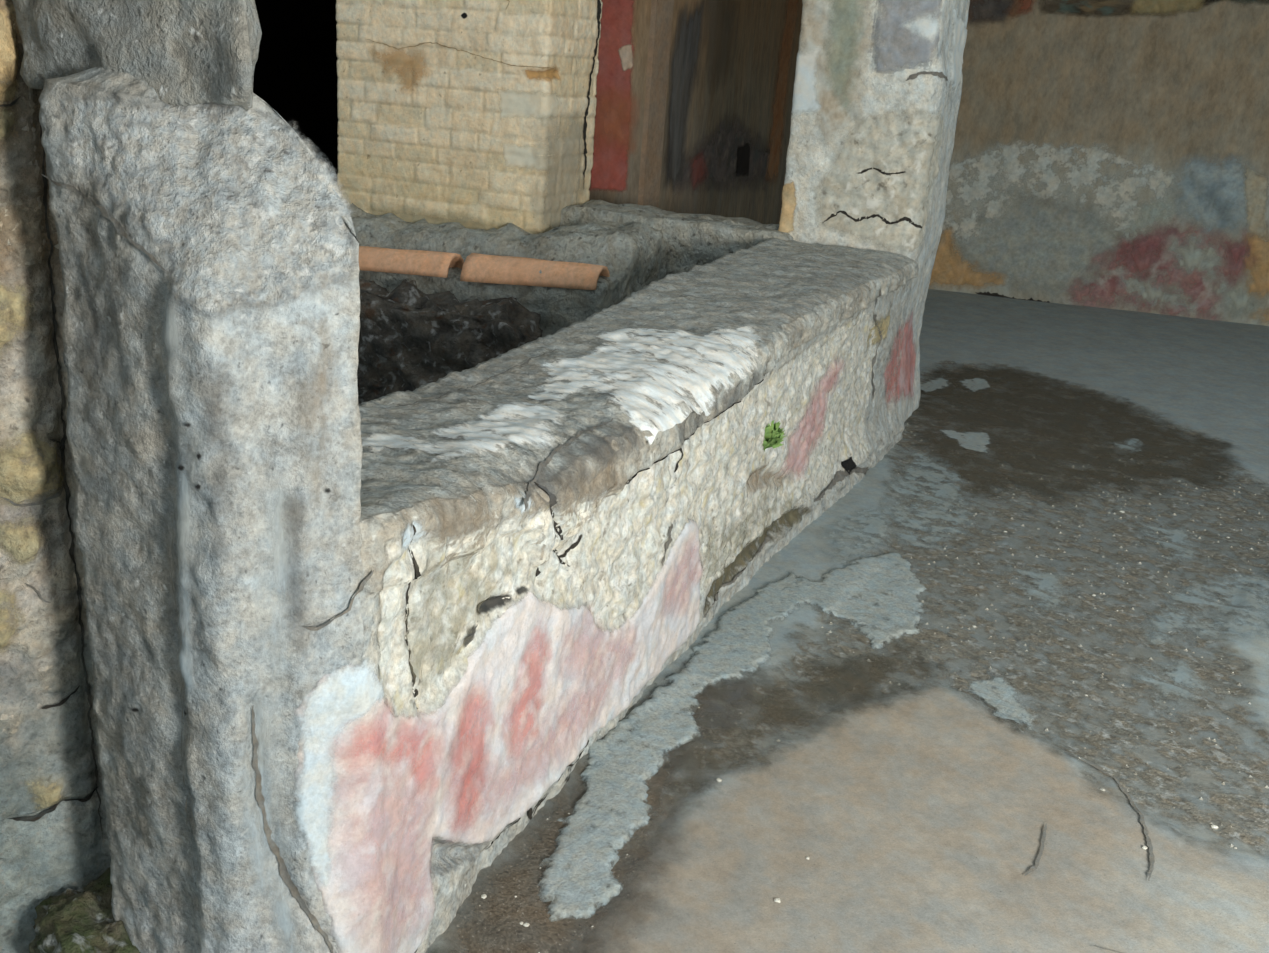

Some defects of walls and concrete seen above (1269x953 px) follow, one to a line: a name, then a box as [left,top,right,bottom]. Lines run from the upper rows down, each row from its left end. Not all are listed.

crack [583,0,601,178]
flaking render [591,0,634,191]
flaking render [778,182,796,233]
crack [822,211,922,229]
spalling [792,0,1269,295]
crack [0,89,168,838]
crack [524,418,614,576]
leakage [914,368,1231,497]
flaking render [294,308,916,953]
leakage [685,646,899,789]
leakage [1016,570,1061,607]
leakage [1138,662,1206,697]